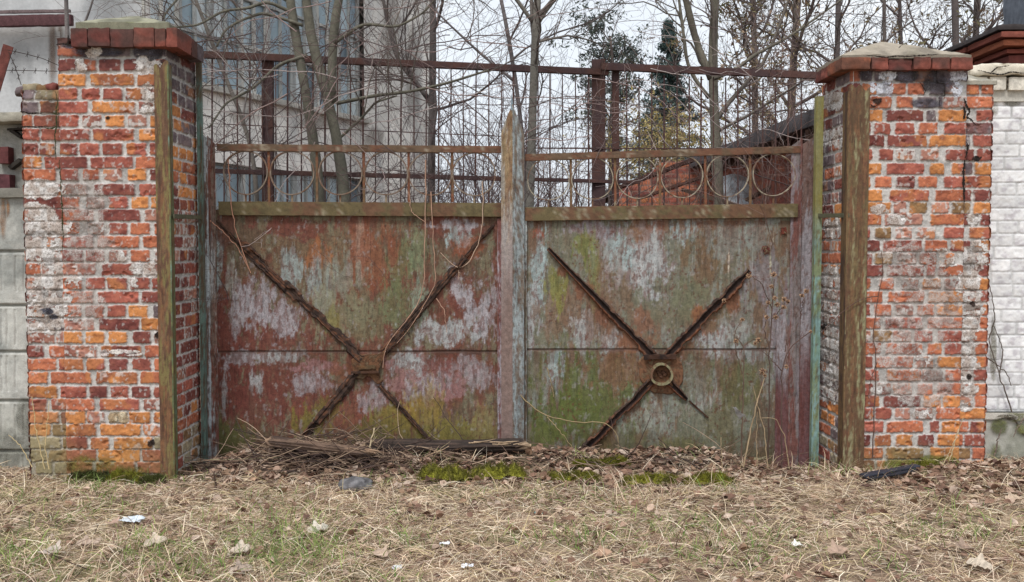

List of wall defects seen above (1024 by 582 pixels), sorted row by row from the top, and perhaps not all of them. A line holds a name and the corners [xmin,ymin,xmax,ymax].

crack [866,44,982,202]